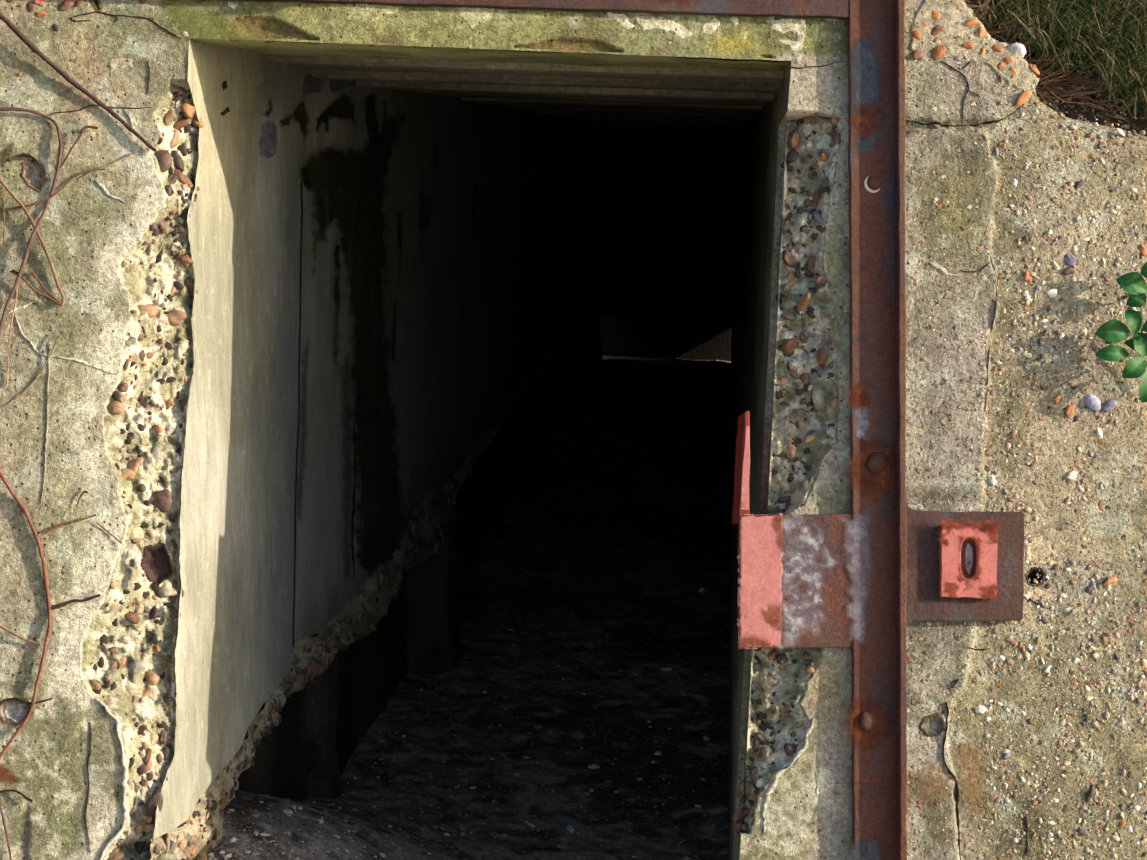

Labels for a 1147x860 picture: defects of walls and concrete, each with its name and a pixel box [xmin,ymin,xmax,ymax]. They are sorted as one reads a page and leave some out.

crack [292,181,303,647]
spalling [82,84,574,860]
water stain [266,94,404,575]
crack [349,420,357,578]
corrosion [762,605,783,630]
corrosion [772,517,784,550]
spalling [765,115,843,515]
corrosion [938,519,1001,599]
spalling [733,648,821,837]
peeling [815,768,835,796]
crack [943,679,961,860]